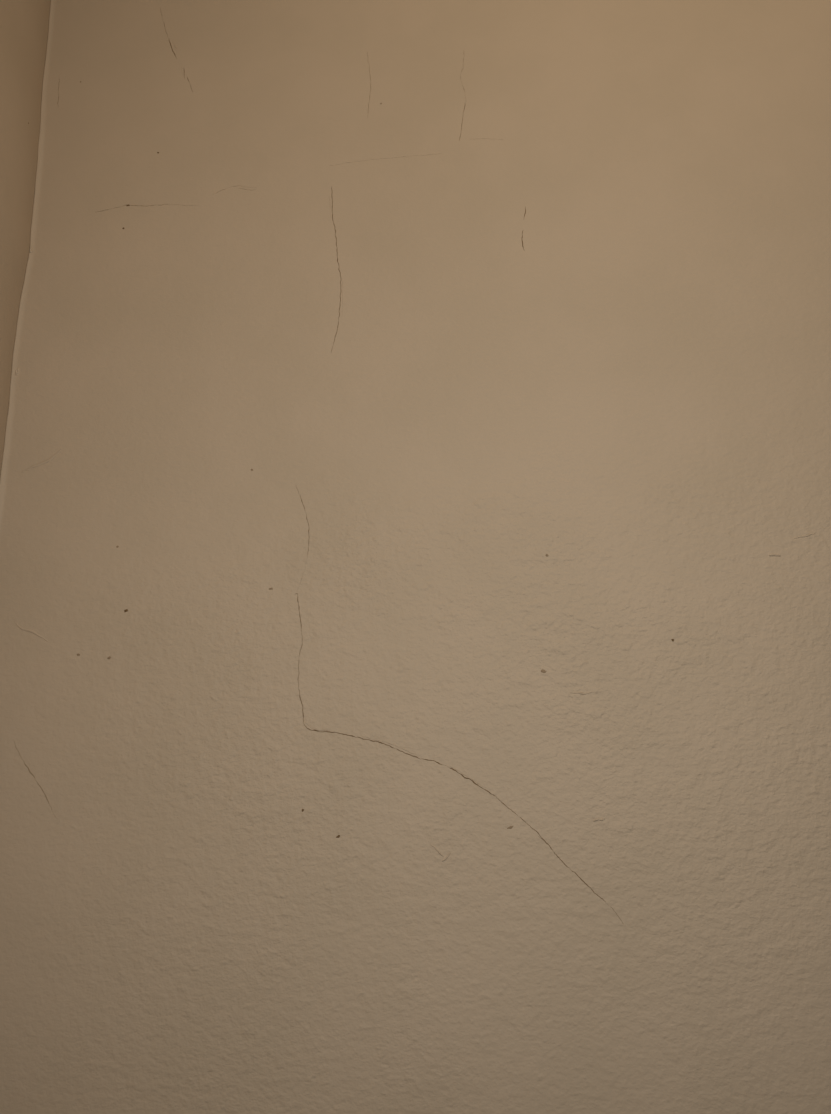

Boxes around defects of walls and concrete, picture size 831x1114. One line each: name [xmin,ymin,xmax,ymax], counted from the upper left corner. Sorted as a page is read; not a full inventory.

crack [329,58,503,351]
crack [296,578,621,920]